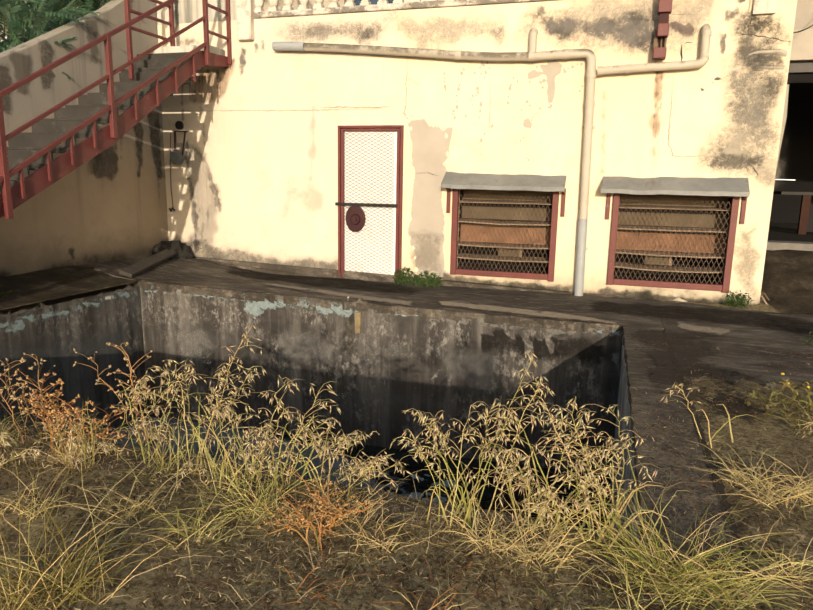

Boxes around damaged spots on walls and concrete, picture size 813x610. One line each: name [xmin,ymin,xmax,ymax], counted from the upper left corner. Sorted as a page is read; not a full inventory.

leakage [0,51,30,114]
leakage [41,40,55,88]
crack [192,59,420,118]
peeling [516,60,583,143]
crack [668,14,705,157]
leakage [705,0,781,181]
leakage [93,146,118,180]
leakage [134,113,166,178]
peeling [403,61,490,280]
leakage [178,195,419,294]
peeling [0,284,424,333]
leakage [480,330,617,363]